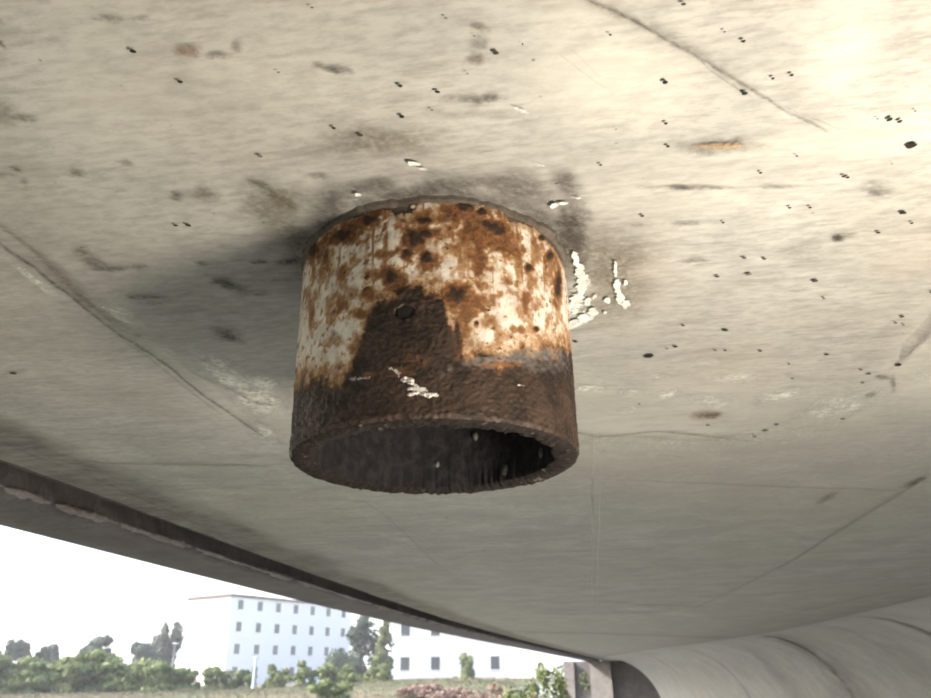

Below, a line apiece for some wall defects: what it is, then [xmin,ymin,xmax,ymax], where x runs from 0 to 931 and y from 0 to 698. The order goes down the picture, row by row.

damp [538,211,585,252]